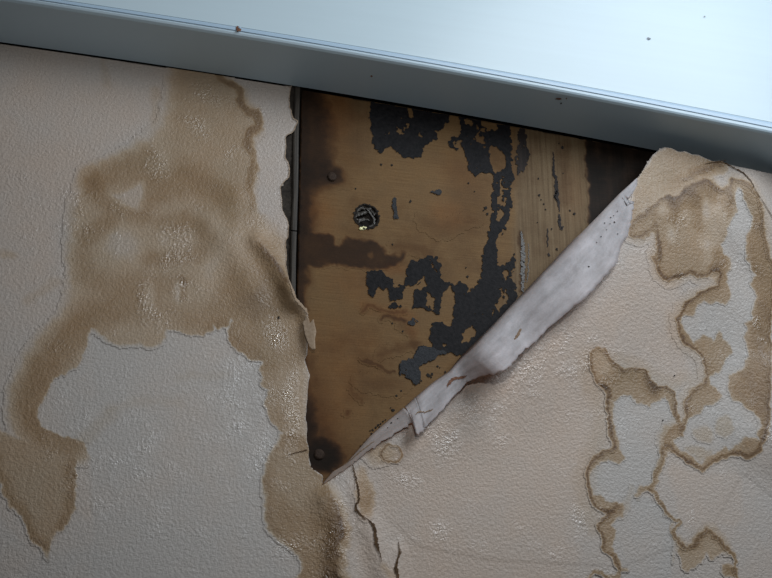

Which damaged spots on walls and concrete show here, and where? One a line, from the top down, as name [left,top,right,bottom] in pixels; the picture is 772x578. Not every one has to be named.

water stain [0,67,408,578]
crack [352,465,402,578]
peeling [400,346,447,385]
water stain [583,148,772,578]